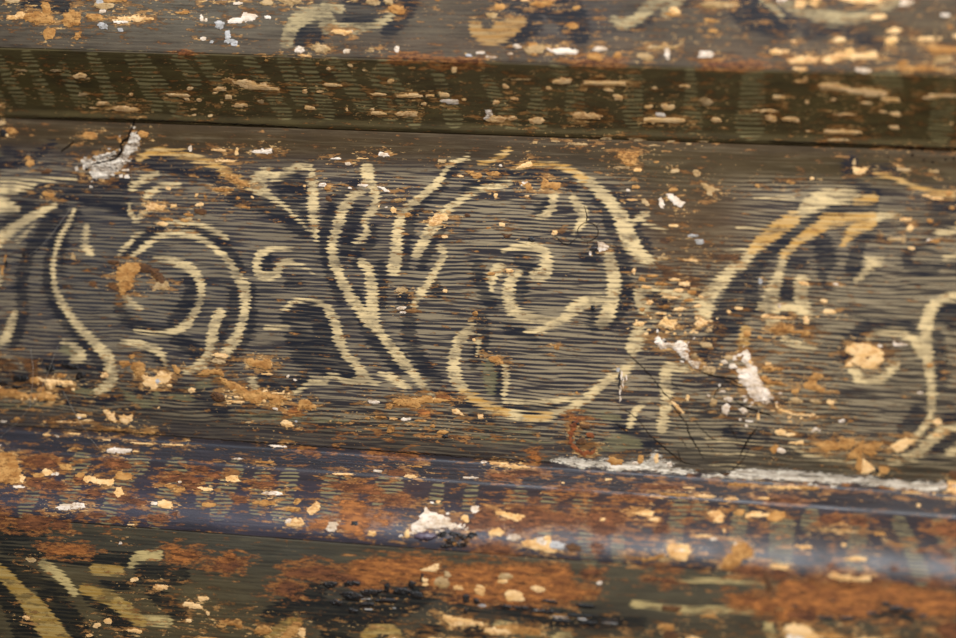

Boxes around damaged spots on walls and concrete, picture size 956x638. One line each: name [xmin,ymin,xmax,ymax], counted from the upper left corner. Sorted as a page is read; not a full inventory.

peeling [5,0,154,40]
peeling [523,44,621,61]
peeling [370,79,466,117]
peeling [769,37,901,129]
crack [90,118,135,165]
peeling [119,354,181,389]
spalling [197,352,317,428]
crack [617,356,773,476]
peeling [0,444,132,498]
peeling [252,491,321,527]
spalling [399,500,581,553]
peeling [625,482,786,562]